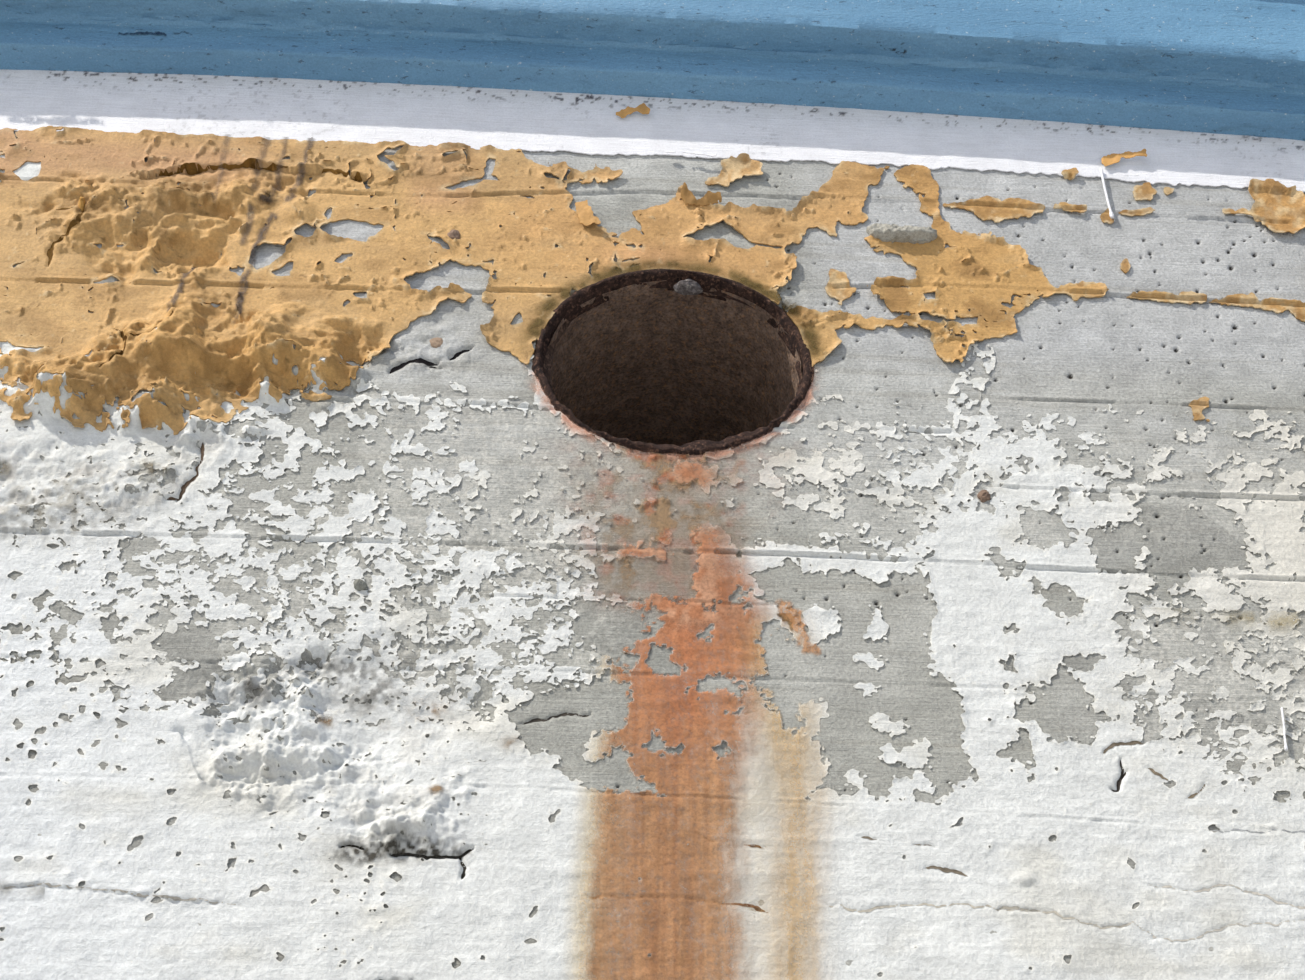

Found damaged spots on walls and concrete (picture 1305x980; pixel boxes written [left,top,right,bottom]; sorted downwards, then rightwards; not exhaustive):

crack [158,158,288,177]
crack [322,168,362,182]
peeling [0,126,1305,901]
rust [779,601,820,653]
rust [589,432,776,980]
leakage [342,835,456,862]
rust [787,734,813,980]
crack [5,882,236,905]
peeling [145,882,165,921]